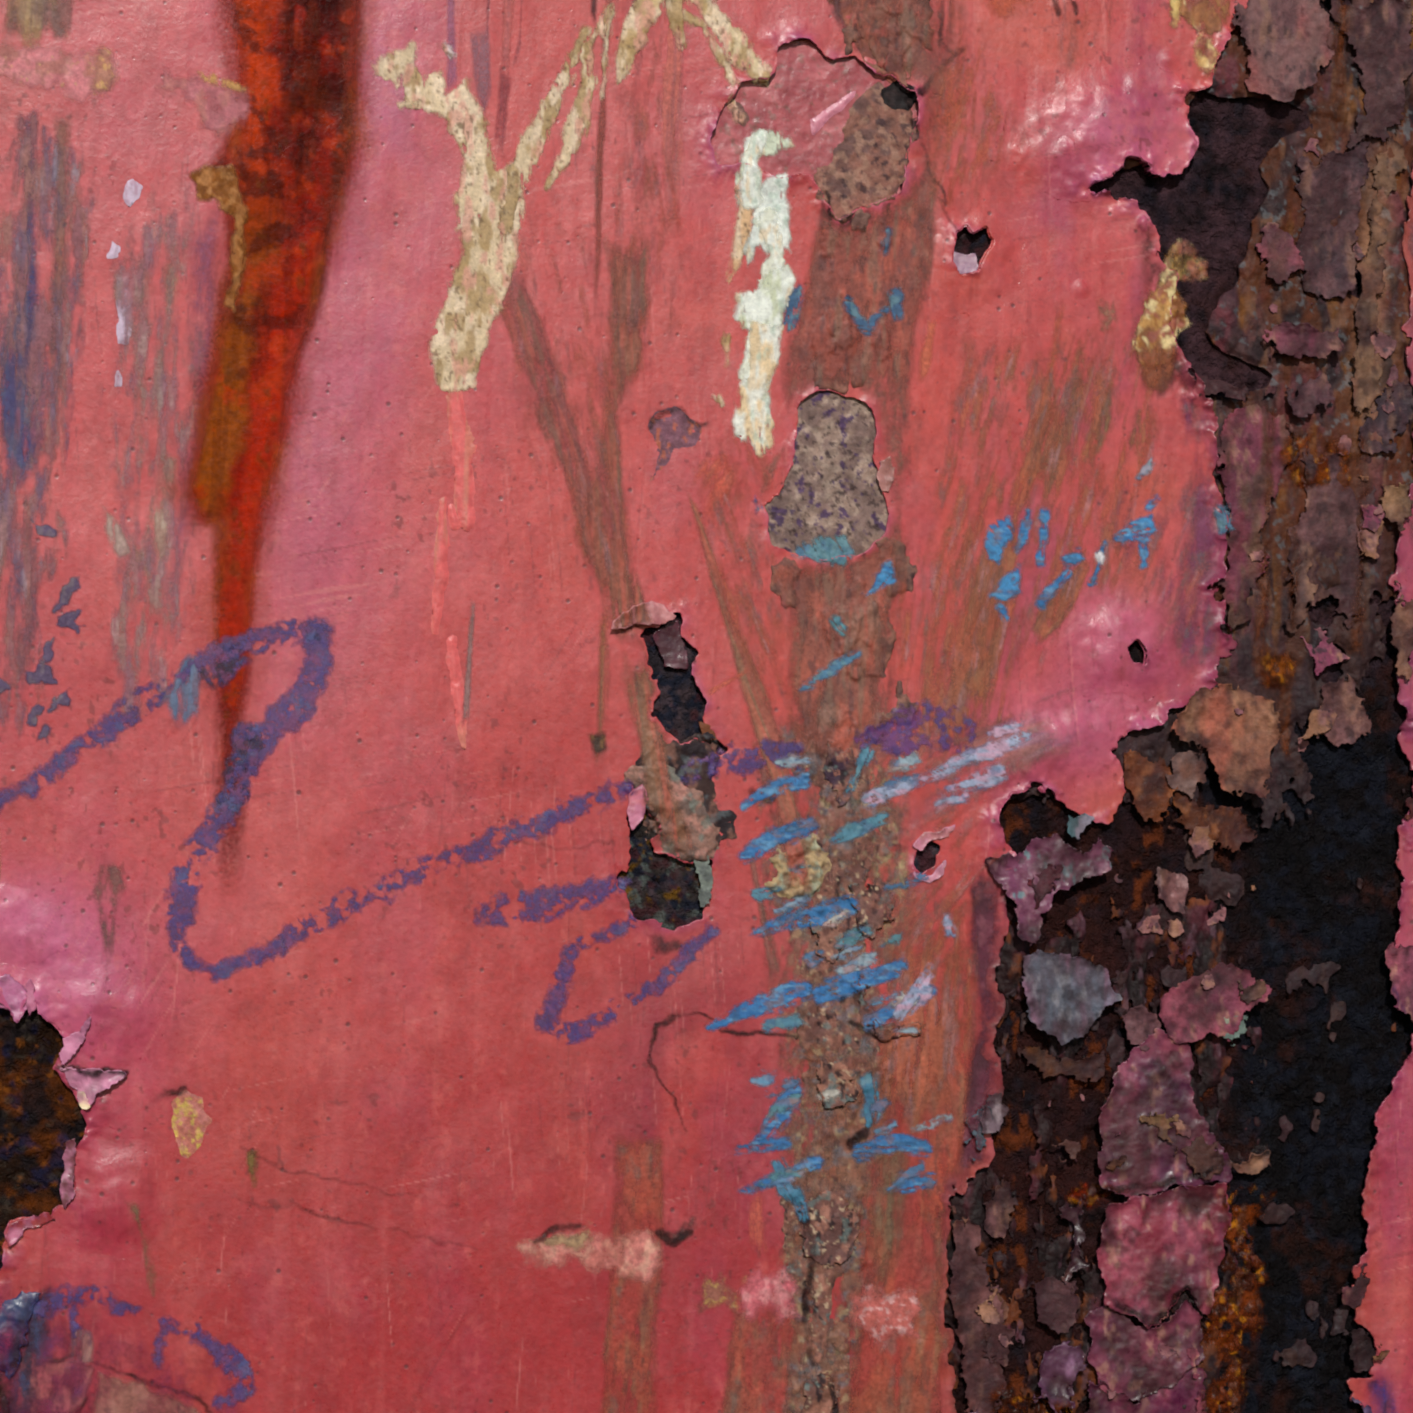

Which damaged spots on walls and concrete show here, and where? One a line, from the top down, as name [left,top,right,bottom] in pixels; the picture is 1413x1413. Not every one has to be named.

peeling [1231,0,1335,103]
corrosion [187,0,367,849]
peeling [710,0,965,759]
corrosion [1177,0,1413,829]
peeling [1165,683,1281,800]
peeling [985,833,1114,946]
crack [651,1014,796,1044]
corrosion [938,702,1245,1413]
peeling [1159,962,1272,1044]
corrosion [1188,1026,1267,1141]
peeling [1096,1182,1232,1329]
corrosion [1171,1181,1295,1413]